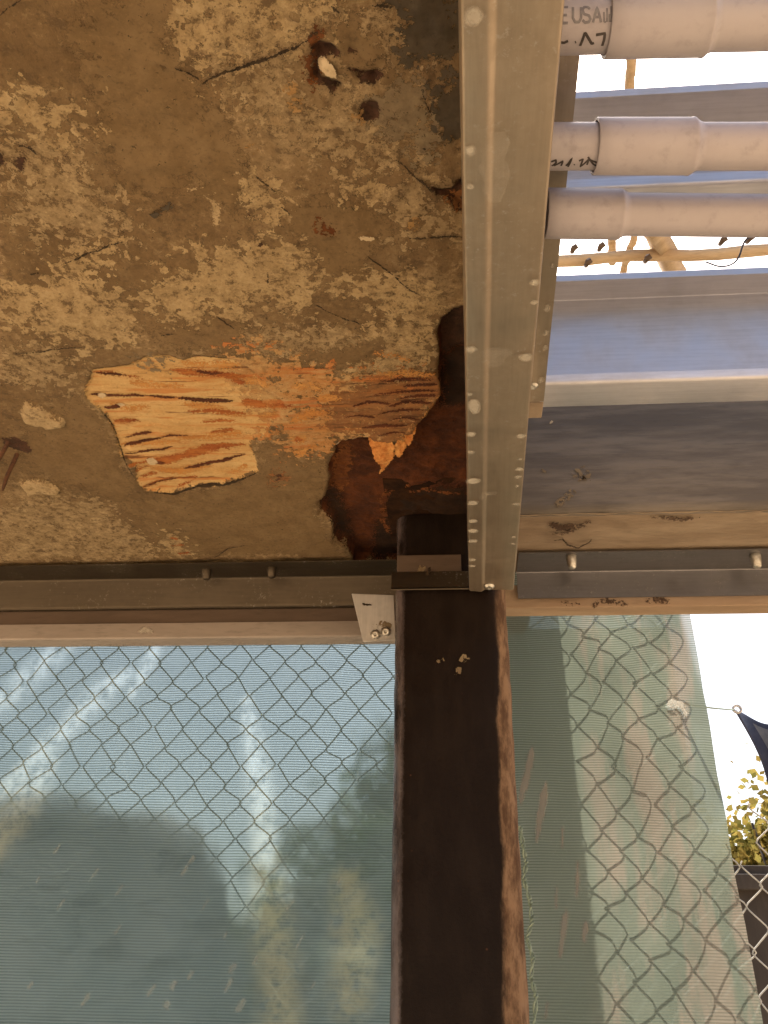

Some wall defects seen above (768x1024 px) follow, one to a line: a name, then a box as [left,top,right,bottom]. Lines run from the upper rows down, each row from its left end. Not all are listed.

crack [175,6,340,84]
corrosion [282,24,388,113]
corrosion [347,100,381,126]
peeling [0,0,467,564]
corrosion [2,437,32,453]
corrosion [203,333,441,488]